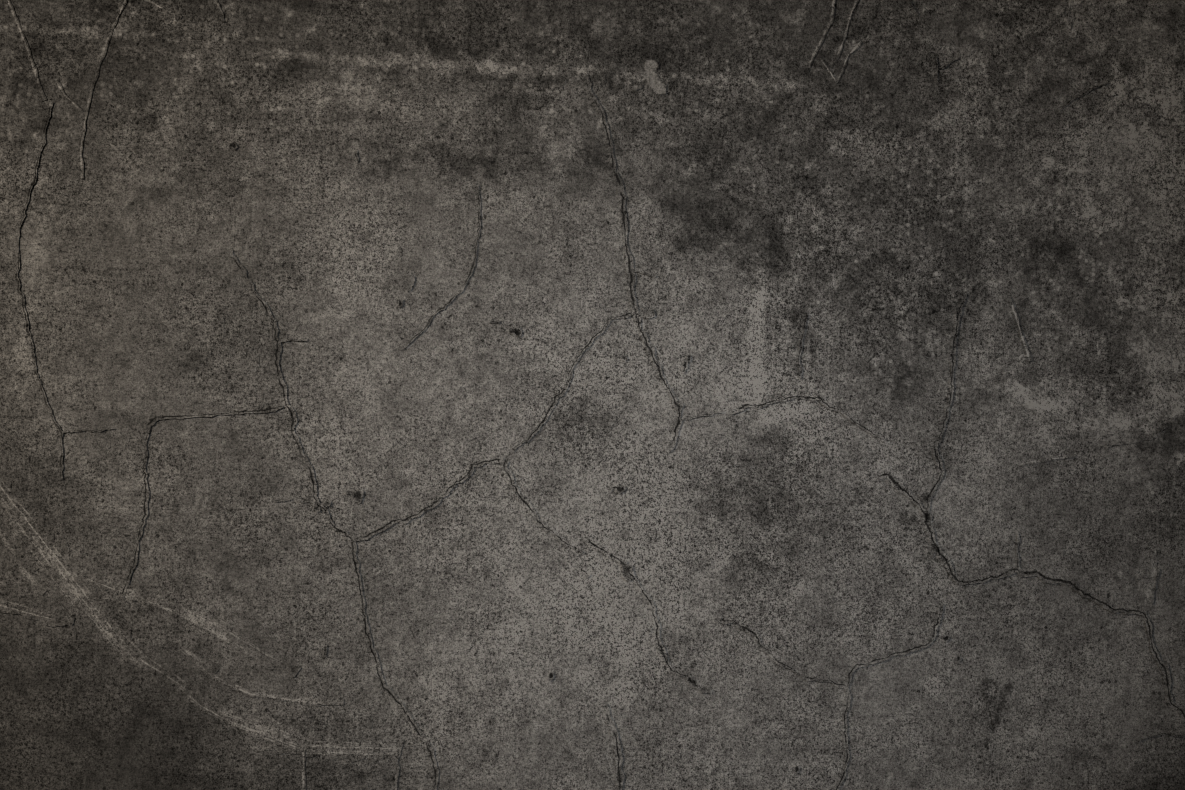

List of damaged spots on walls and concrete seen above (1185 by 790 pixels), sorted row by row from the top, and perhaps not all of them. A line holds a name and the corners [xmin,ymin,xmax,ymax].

crack [118,75,887,790]
crack [715,292,1185,790]